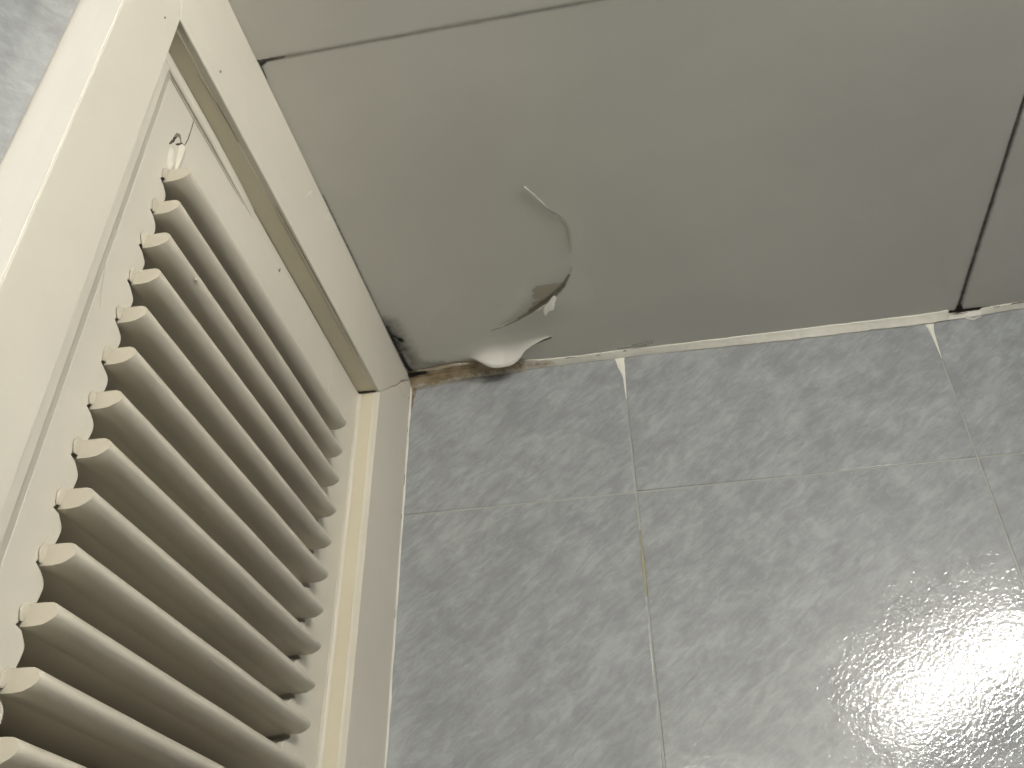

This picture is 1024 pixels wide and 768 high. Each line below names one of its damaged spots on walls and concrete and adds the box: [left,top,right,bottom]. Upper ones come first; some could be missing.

peeling [497,267,593,332]
damp [381,318,420,377]